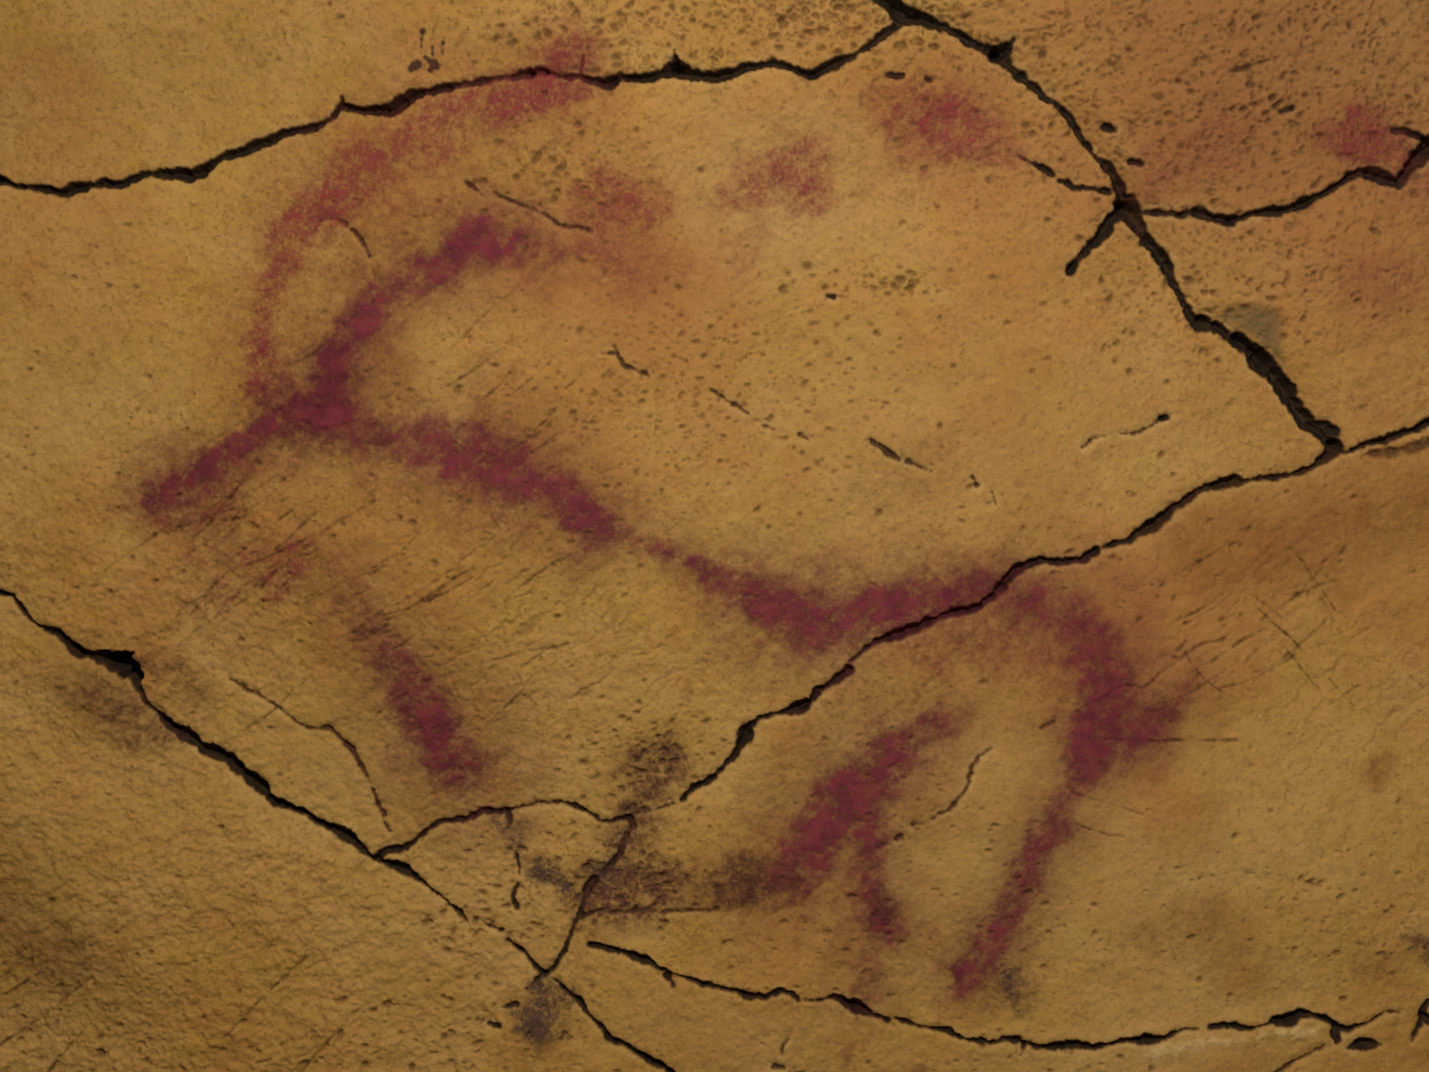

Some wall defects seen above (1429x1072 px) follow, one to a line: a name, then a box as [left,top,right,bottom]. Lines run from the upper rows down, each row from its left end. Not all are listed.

crack [0,0,1429,802]
crack [0,589,719,989]
crack [883,750,988,845]
crack [555,978,675,1072]
crack [587,941,1395,1072]
crack [1412,999,1429,1041]